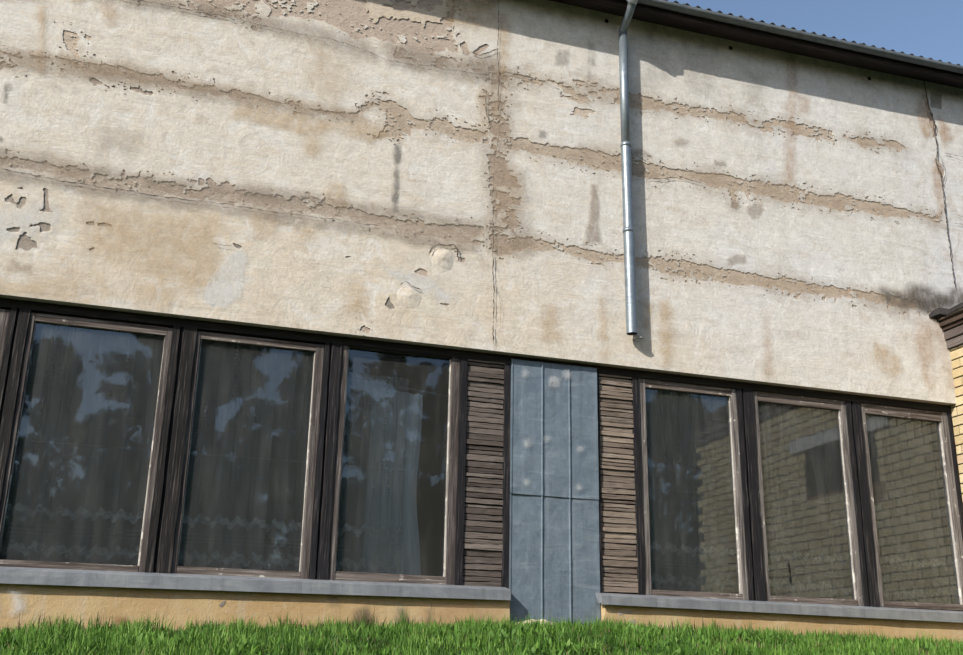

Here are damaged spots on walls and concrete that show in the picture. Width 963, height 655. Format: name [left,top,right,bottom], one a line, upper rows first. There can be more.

peeling [0,0,942,316]